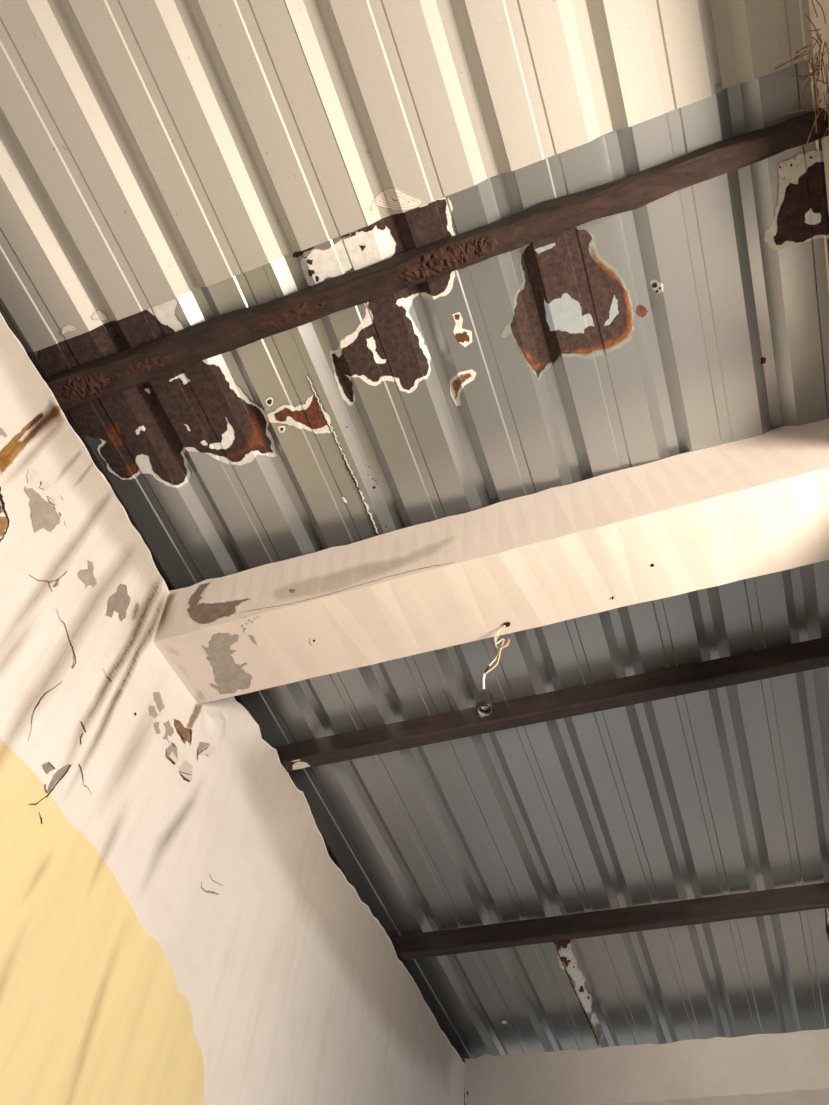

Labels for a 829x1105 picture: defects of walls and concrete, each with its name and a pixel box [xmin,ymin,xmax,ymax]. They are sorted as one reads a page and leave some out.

corrosion [293,197,455,286]
corrosion [764,150,829,250]
corrosion [38,299,184,378]
corrosion [329,271,455,406]
corrosion [453,312,473,347]
corrosion [501,227,648,380]
corrosion [0,359,387,536]
crack [0,487,10,542]
peeling [24,468,66,532]
peeling [187,582,259,694]
peeling [149,692,216,782]
corrosion [554,940,604,1045]